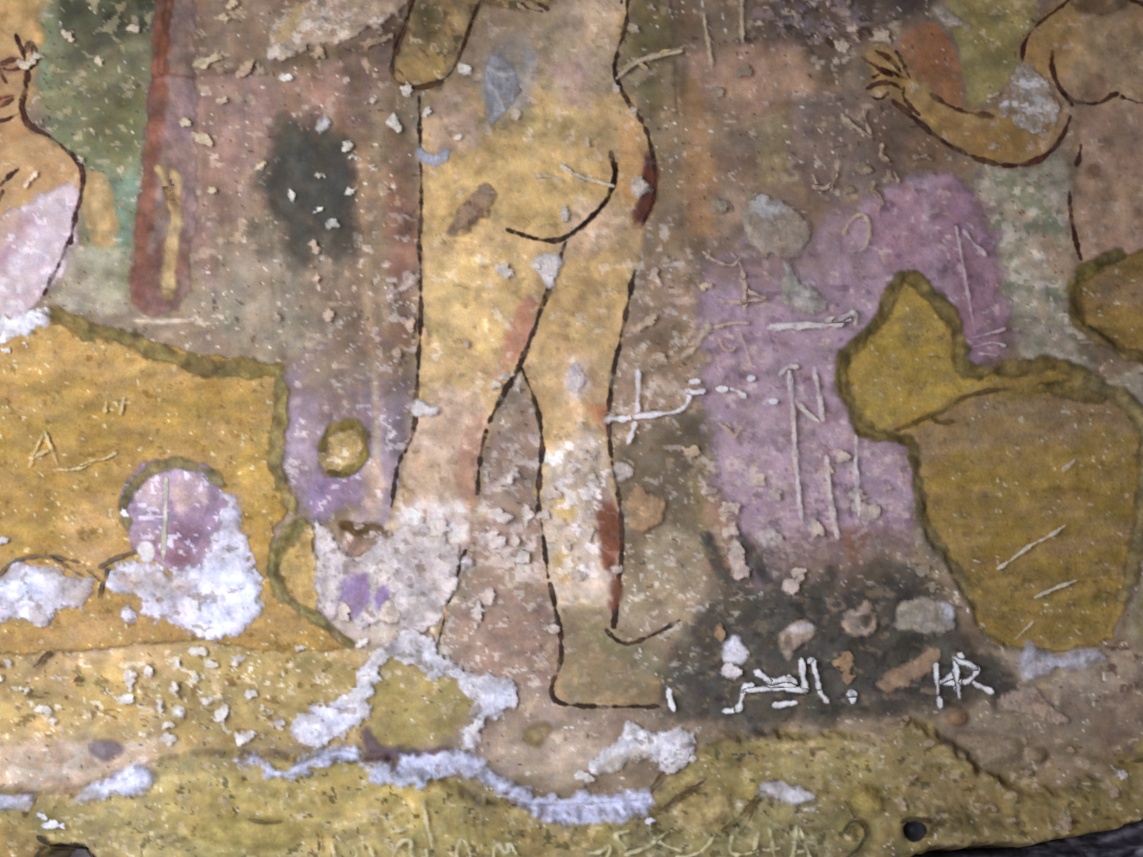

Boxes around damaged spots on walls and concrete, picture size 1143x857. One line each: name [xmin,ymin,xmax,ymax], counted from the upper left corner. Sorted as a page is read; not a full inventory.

spalling [834,39,849,53]
spalling [869,29,891,44]
spalling [934,8,969,28]
water stain [263,123,355,266]
water stain [681,533,1106,732]
water stain [233,728,655,825]